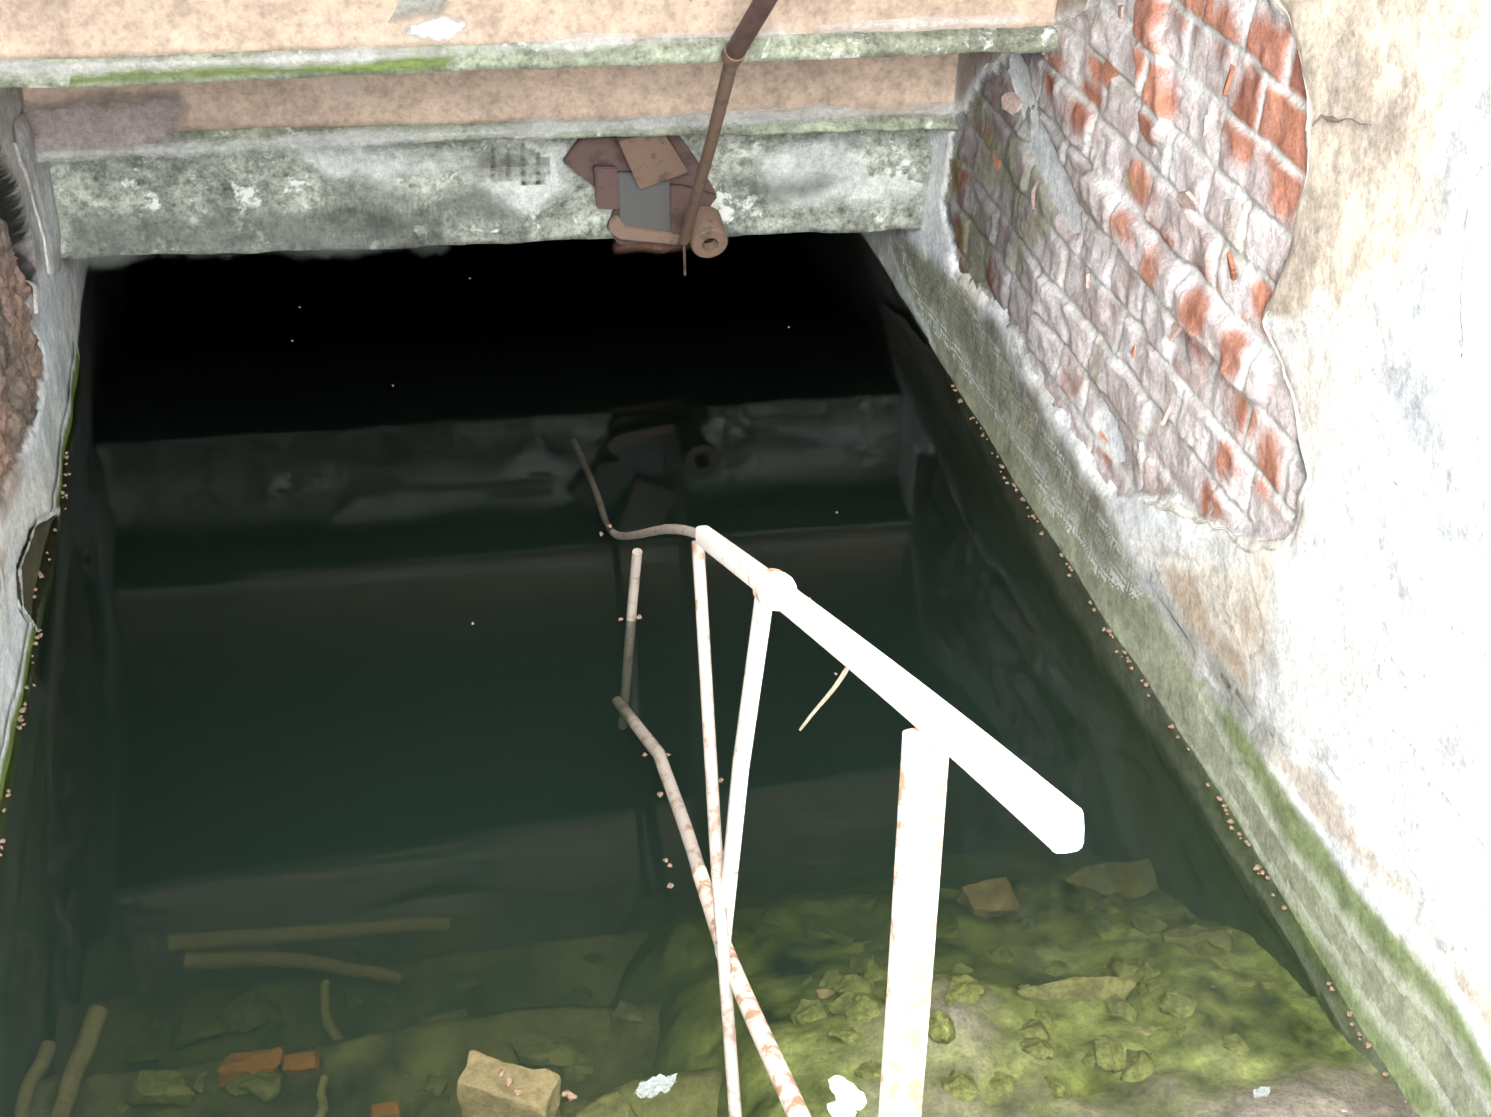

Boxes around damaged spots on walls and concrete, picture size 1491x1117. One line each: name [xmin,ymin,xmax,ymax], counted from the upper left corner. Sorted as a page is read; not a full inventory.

flaking render [944,0,1491,553]
flaking render [0,505,61,633]